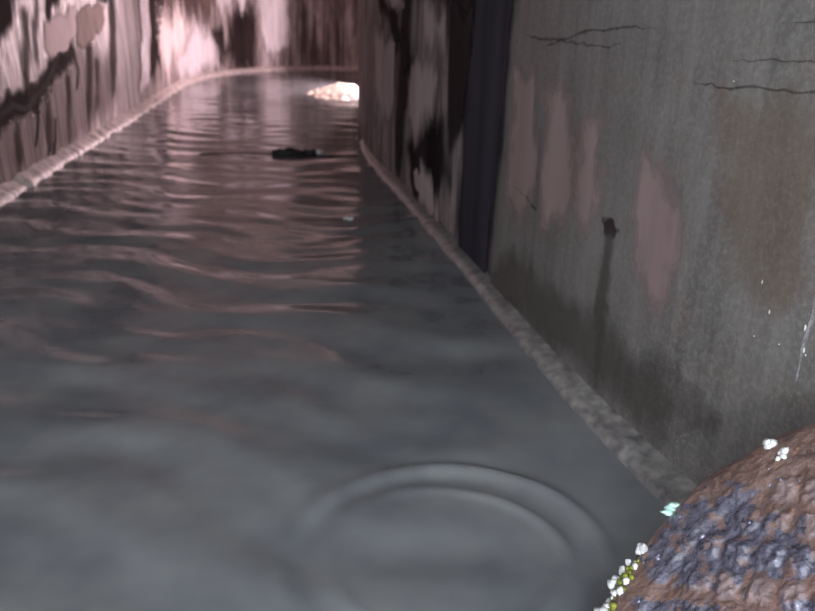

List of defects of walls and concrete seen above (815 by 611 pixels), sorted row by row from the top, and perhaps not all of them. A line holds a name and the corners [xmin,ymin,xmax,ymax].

damp [0,0,60,100]
damp [87,44,100,126]
damp [97,0,117,109]
damp [16,123,24,170]
damp [379,0,679,422]